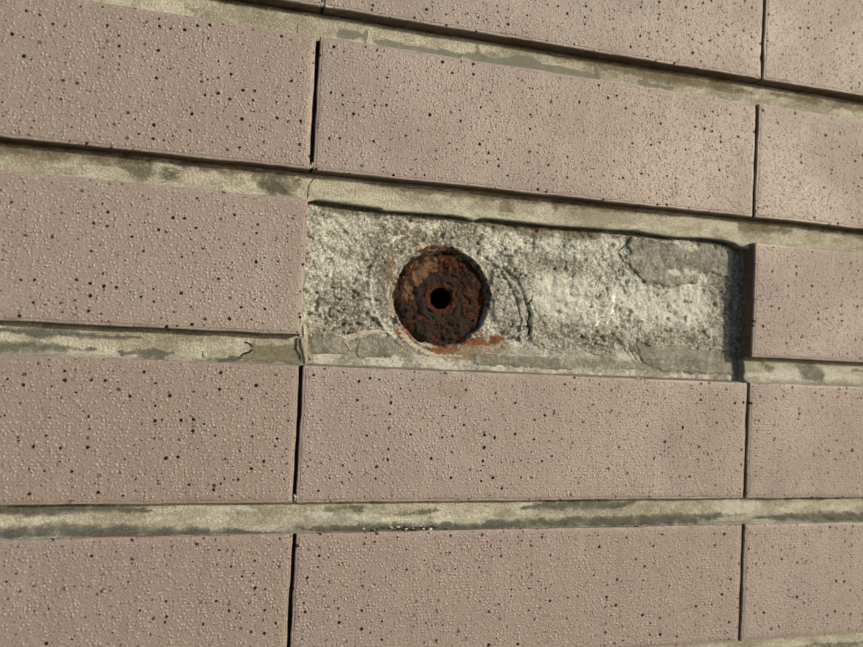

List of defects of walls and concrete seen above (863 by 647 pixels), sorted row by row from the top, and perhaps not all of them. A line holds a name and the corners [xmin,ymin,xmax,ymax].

corrosion [392,279,504,354]
corrosion [416,245,492,310]
spalling [298,201,739,381]